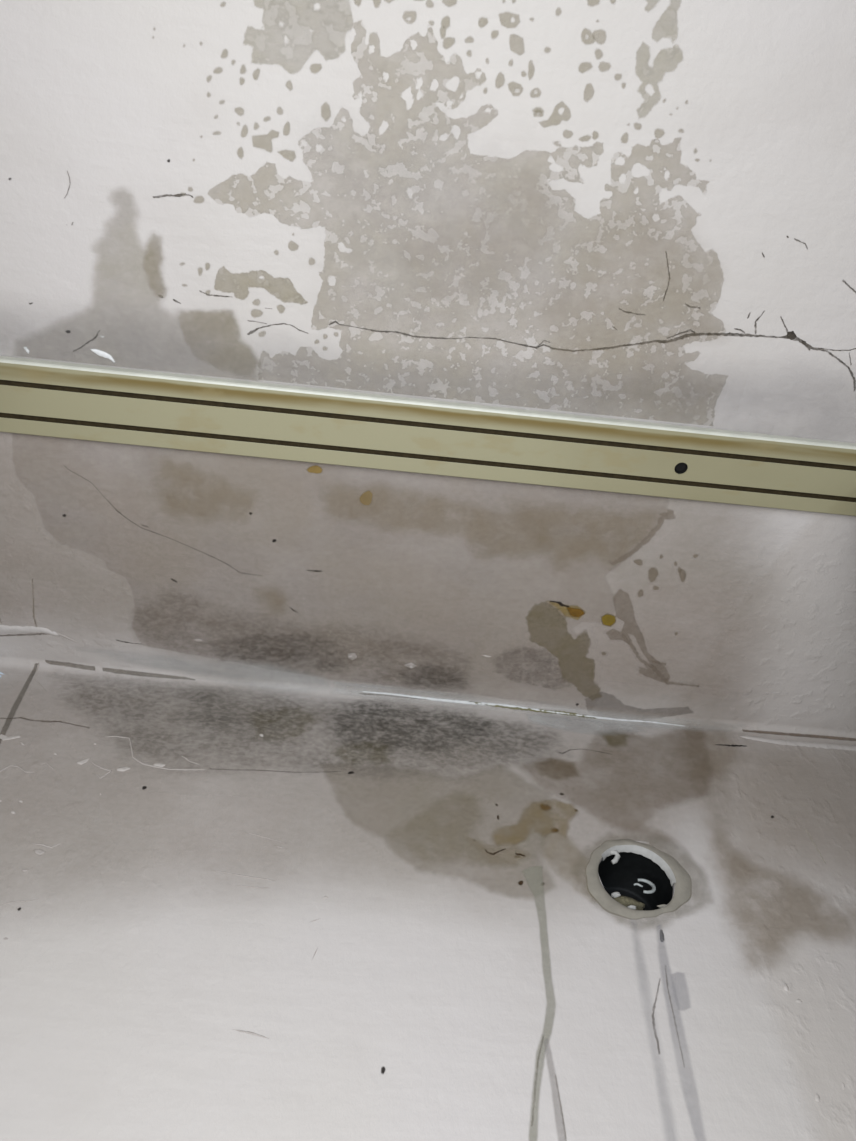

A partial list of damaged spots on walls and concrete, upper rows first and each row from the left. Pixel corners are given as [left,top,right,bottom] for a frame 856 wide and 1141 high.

water stain [479,16,523,53]
water stain [484,64,534,95]
water stain [580,29,624,87]
water stain [238,118,295,157]
water stain [537,111,597,140]
crack [153,192,193,200]
water stain [215,267,307,317]
crack [248,323,301,335]
crack [329,253,856,391]
water stain [610,555,686,684]
water stain [527,603,661,719]
water stain [523,867,553,1141]